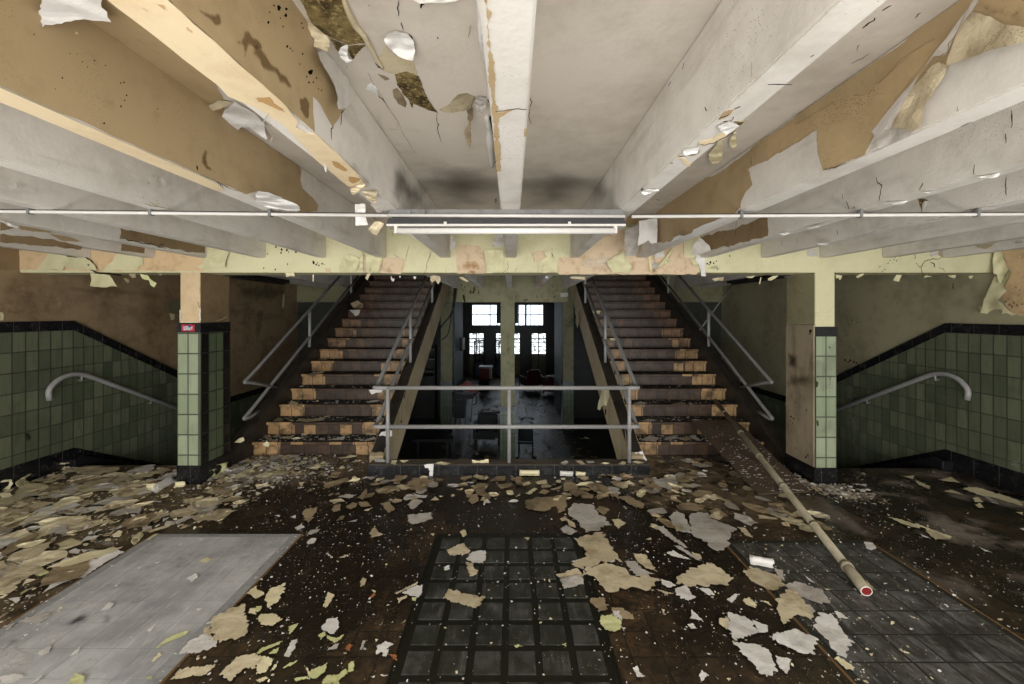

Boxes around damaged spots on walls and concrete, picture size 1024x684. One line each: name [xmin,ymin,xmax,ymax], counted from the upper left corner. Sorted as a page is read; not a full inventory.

leakage [242,32,290,86]
peeling [0,0,512,235]
peeling [540,0,1024,281]
peeling [0,221,229,288]
peeling [313,251,405,281]
peeling [450,234,504,282]
peeling [975,239,1024,316]